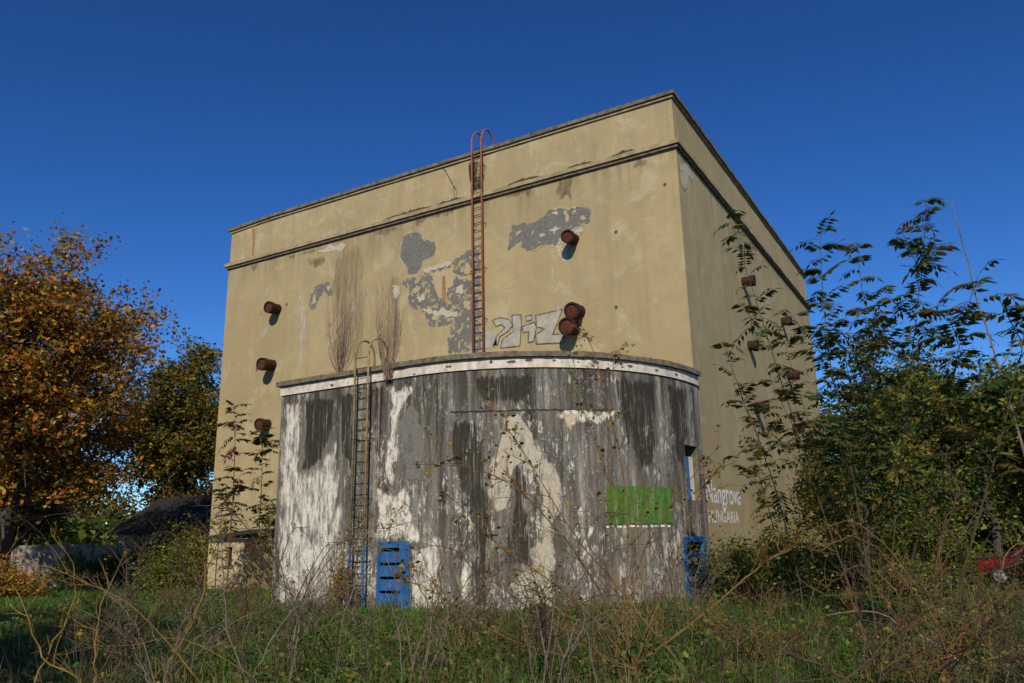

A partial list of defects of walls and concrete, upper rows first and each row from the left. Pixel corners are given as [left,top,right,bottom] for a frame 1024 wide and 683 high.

peeling [508,206,591,261]
peeling [309,282,333,311]
peeling [392,231,482,368]
damp [302,394,356,469]
damp [476,374,532,404]
damp [616,377,687,472]
damp [452,421,490,606]
damp [508,467,528,565]